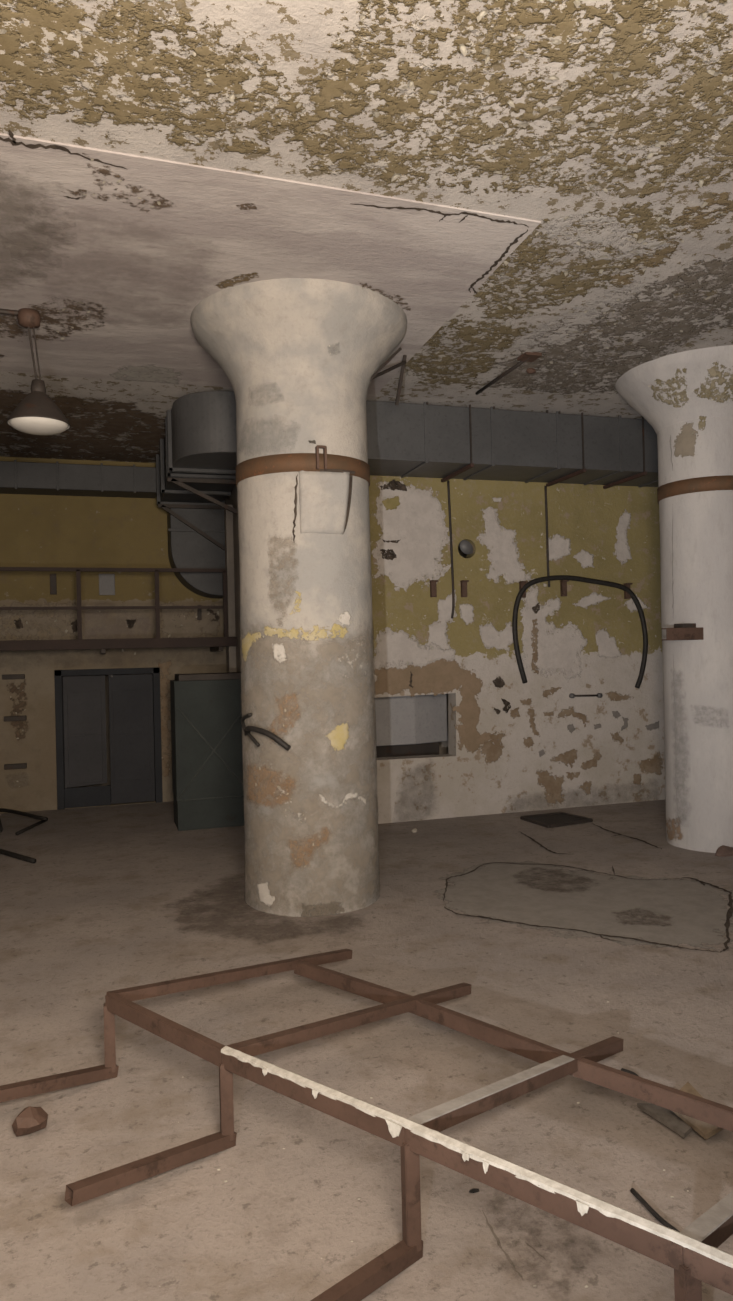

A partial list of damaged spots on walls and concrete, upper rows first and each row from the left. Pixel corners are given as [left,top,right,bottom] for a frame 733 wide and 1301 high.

crack [0,130,126,169]
peeling [0,0,733,458]
crack [353,204,528,294]
damp [0,389,165,463]
peeling [160,603,220,638]
peeling [242,469,650,805]
flaking render [158,661,172,777]
peeling [319,792,366,808]
peeling [257,882,275,906]
crack [443,823,733,953]